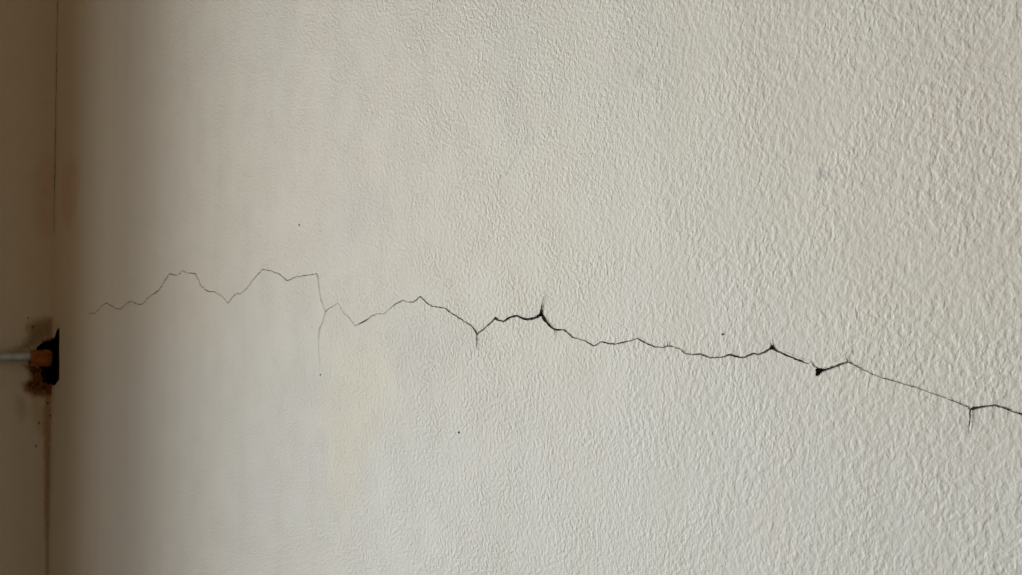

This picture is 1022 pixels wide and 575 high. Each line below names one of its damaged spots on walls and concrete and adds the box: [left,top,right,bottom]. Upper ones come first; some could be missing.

crack [89,269,1022,434]